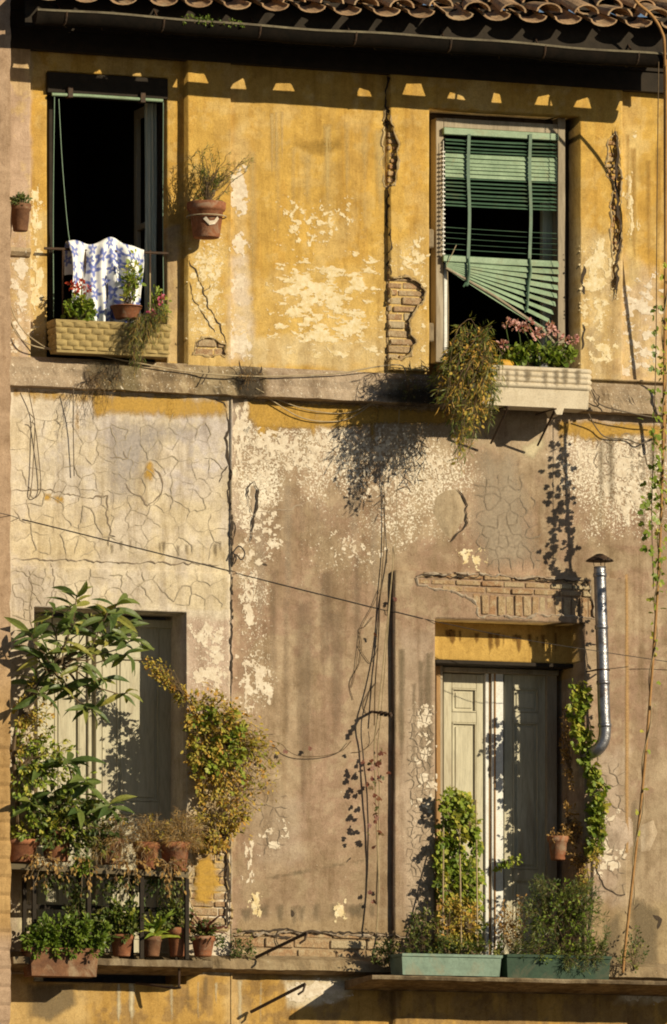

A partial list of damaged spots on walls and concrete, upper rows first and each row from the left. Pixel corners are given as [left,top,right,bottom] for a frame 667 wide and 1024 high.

peeling [186,231,253,362]
peeling [231,165,250,217]
peeling [266,193,430,363]
crack [385,190,393,275]
crack [614,131,622,299]
peeling [578,129,664,378]
crack [12,261,310,695]
peeling [186,399,455,714]
crack [418,474,587,582]
spalling [415,544,595,620]
crack [219,707,435,949]
crack [593,756,662,929]